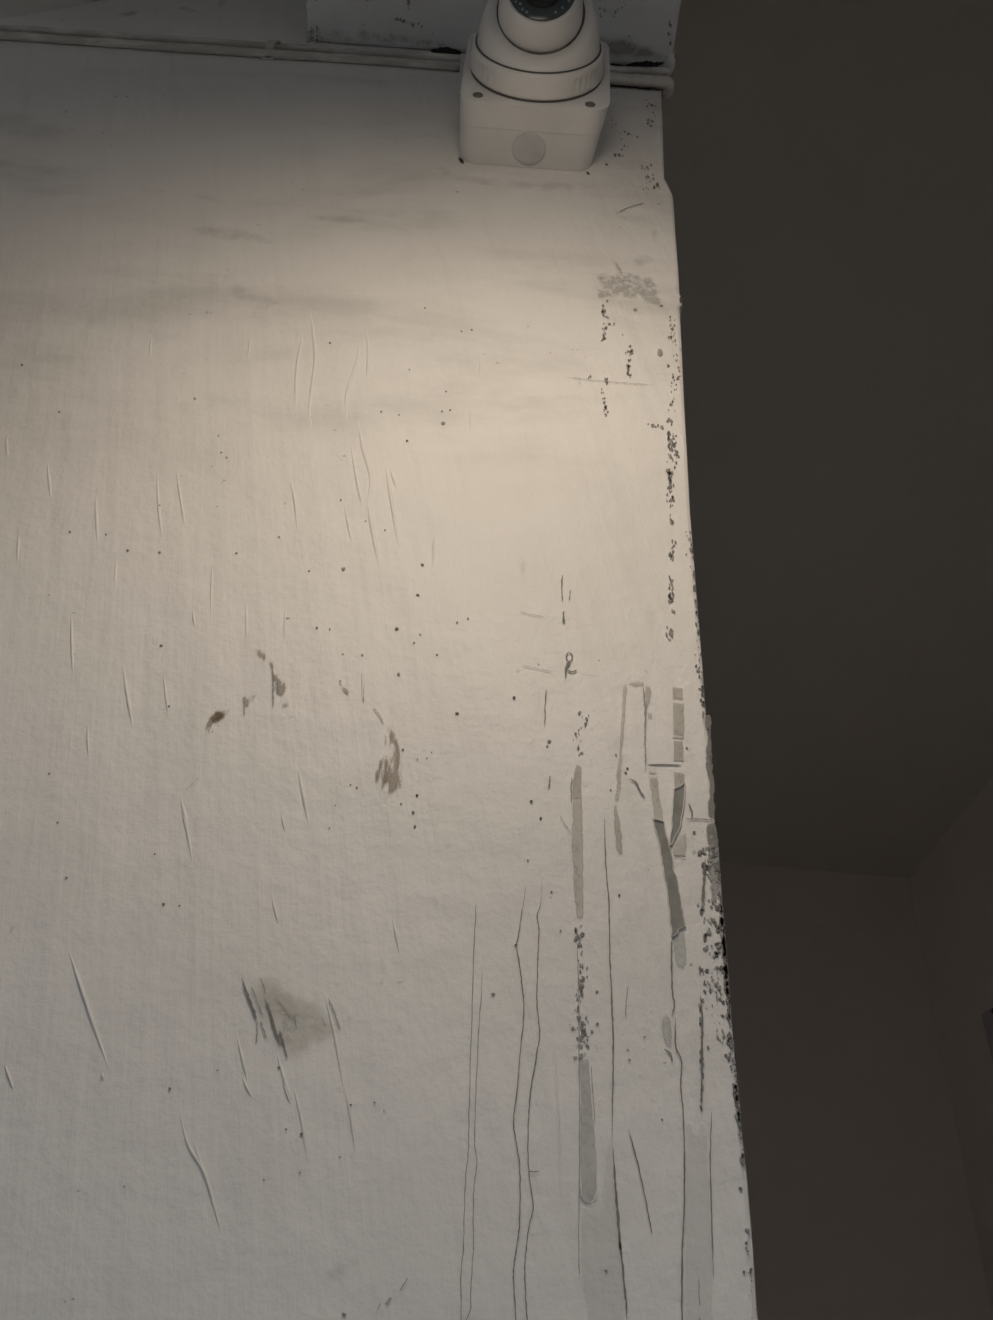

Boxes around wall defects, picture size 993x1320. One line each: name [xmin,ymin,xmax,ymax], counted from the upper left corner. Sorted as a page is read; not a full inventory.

spalling [601,300,633,378]
crack [522,665,552,723]
peeling [610,296,745,1166]
water stain [241,978,297,1058]
crack [460,907,483,1320]
crack [513,887,542,1320]
crack [575,945,583,1276]
peeling [560,711,599,1204]
crack [604,820,627,1319]